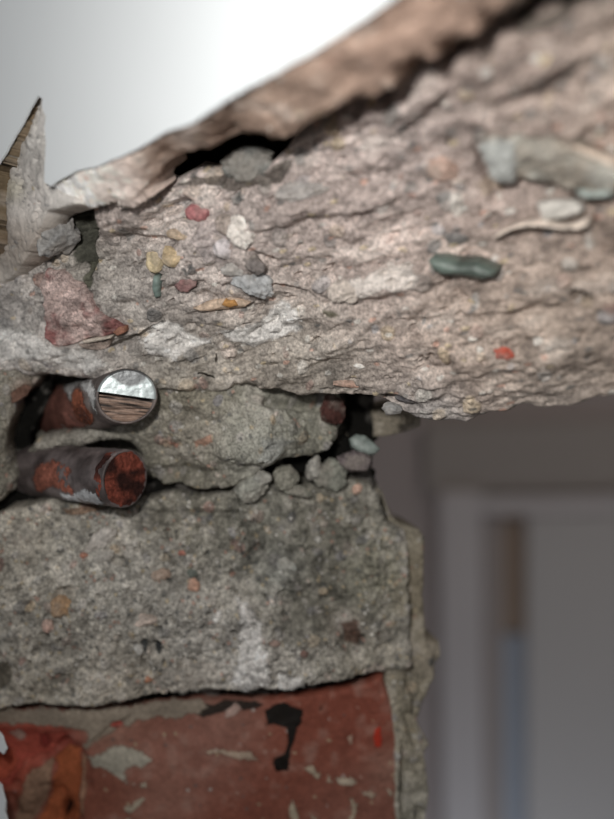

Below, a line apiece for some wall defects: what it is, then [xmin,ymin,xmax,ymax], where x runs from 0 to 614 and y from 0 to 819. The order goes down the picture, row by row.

spalling [516,0,576,35]
spalling [174,131,298,191]
spalling [0,100,101,288]
peeling [478,132,614,239]
rust [11,385,31,403]
rust [38,385,93,433]
rust [33,459,74,496]
rust [65,451,146,515]
spalling [0,662,13,689]
crack [21,700,71,708]
crack [107,672,371,704]
spalling [0,727,87,819]